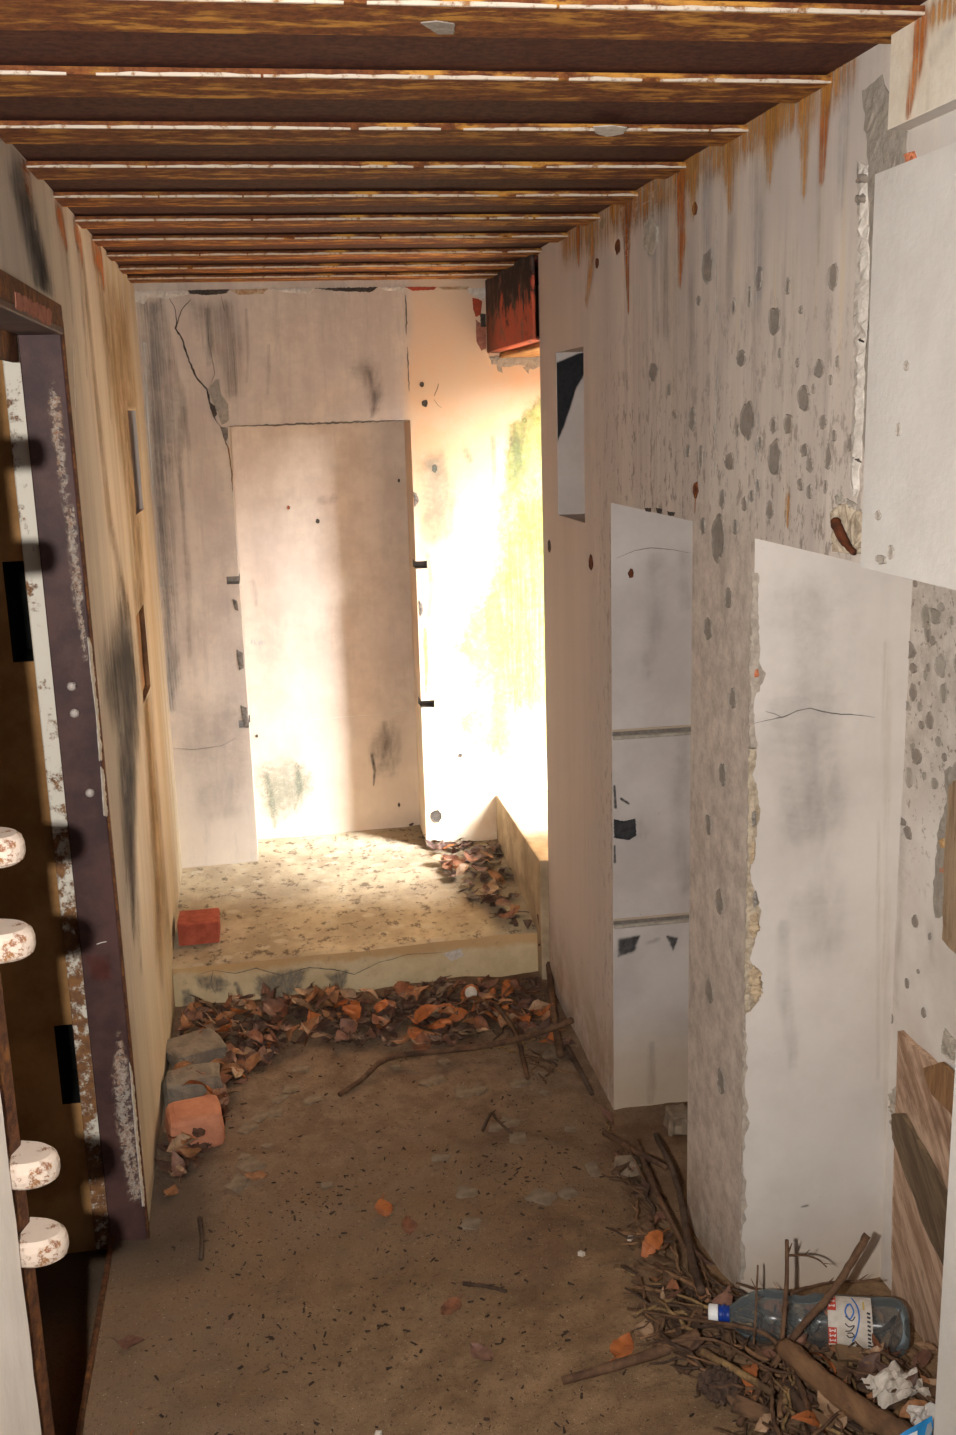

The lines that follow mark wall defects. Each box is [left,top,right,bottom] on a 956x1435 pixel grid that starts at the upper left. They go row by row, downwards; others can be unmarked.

rust [906,0,955,116]
rust [56,204,104,289]
crack [169,297,233,492]
rust [561,61,855,313]
peeling [649,74,917,565]
spalling [716,572,766,1280]
crack [756,708,875,723]
spalling [900,817,912,840]
flaking render [905,602,956,940]
flaking render [941,1028,956,1063]